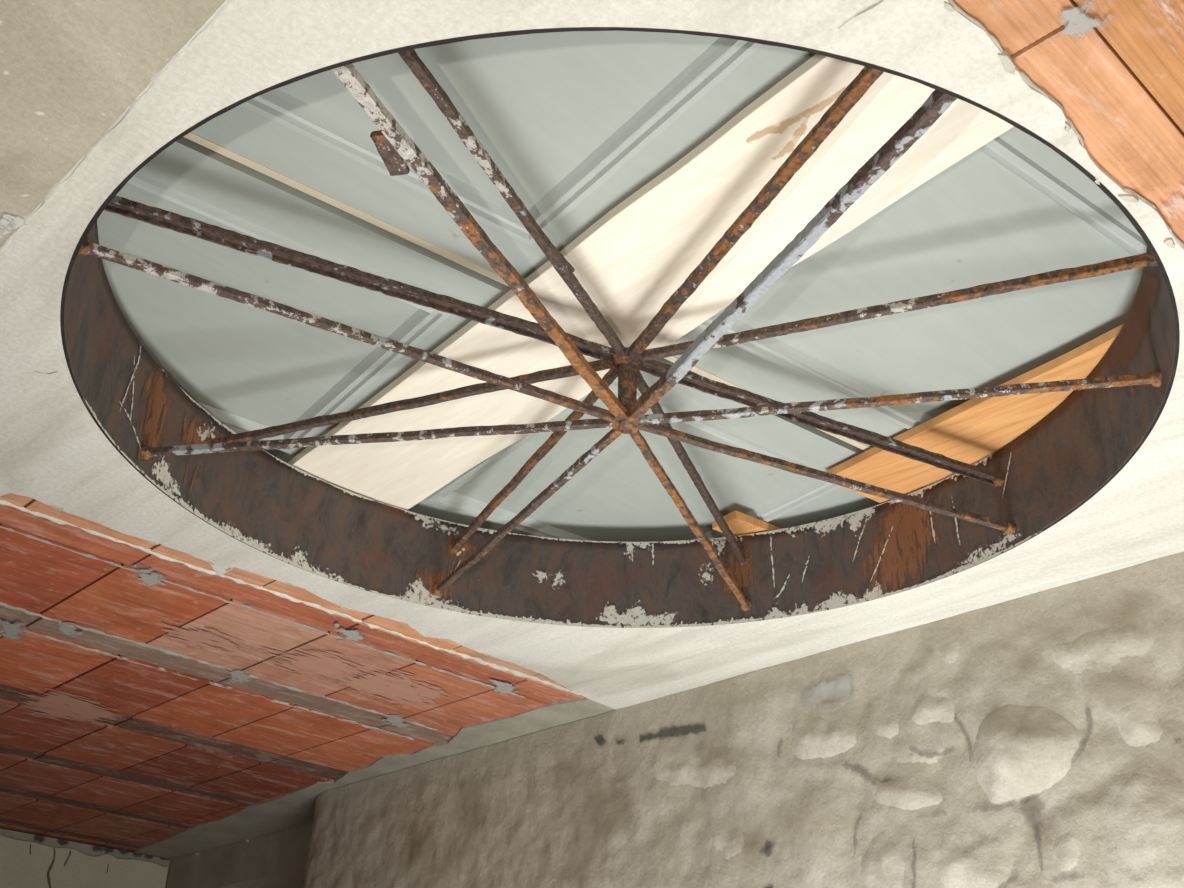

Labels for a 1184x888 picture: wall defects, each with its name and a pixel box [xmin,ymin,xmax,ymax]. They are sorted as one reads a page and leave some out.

flaking render [944,0,1085,147]
flaking render [1118,188,1184,249]
corrosion [1109,272,1157,394]
corrosion [138,372,169,462]
corrosion [182,415,220,445]
peeling [183,390,237,441]
peeling [85,400,1042,628]
corrosion [863,491,939,593]